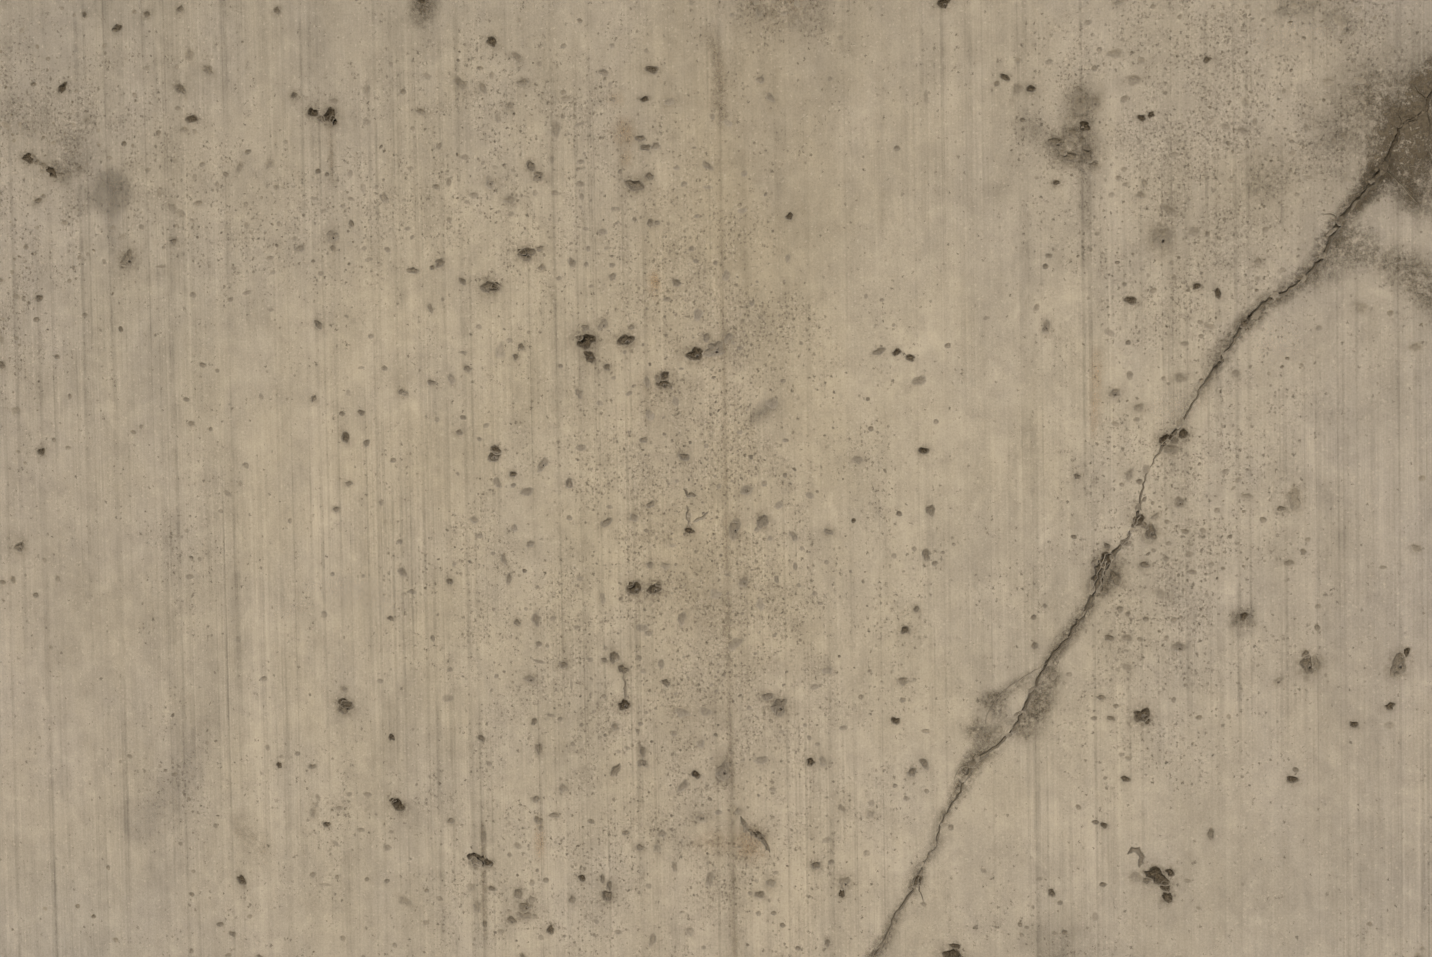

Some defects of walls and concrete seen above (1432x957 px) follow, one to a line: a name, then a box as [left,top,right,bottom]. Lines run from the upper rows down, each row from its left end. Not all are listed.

crack [870,83,1432,957]